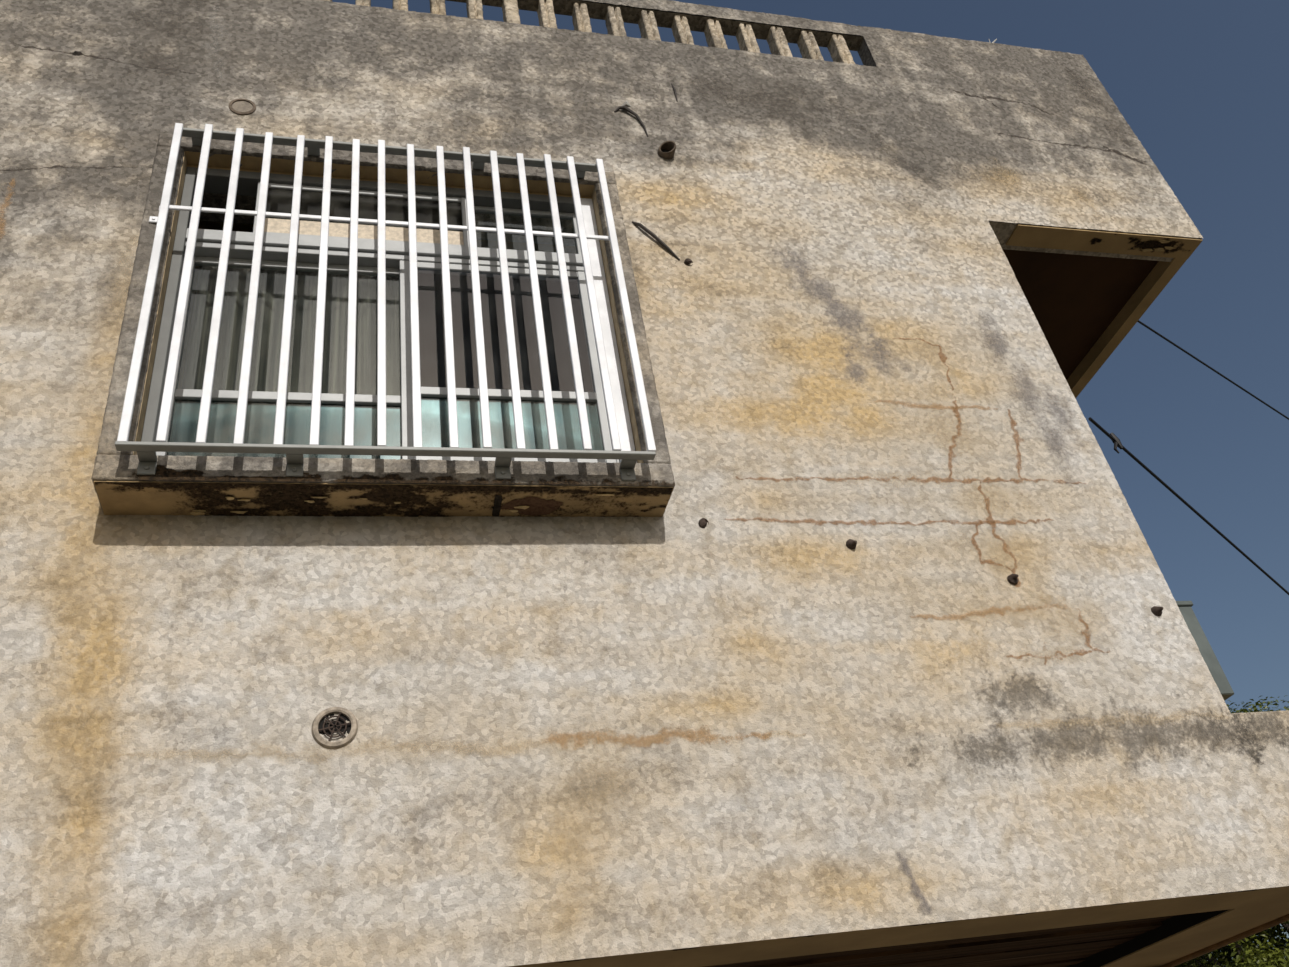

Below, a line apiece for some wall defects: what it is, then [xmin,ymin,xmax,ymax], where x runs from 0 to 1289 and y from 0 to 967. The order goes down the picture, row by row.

peeling [1090,234,1190,253]
crack [729,338,1086,587]
spalling [492,495,563,516]
crack [1008,619,1103,663]